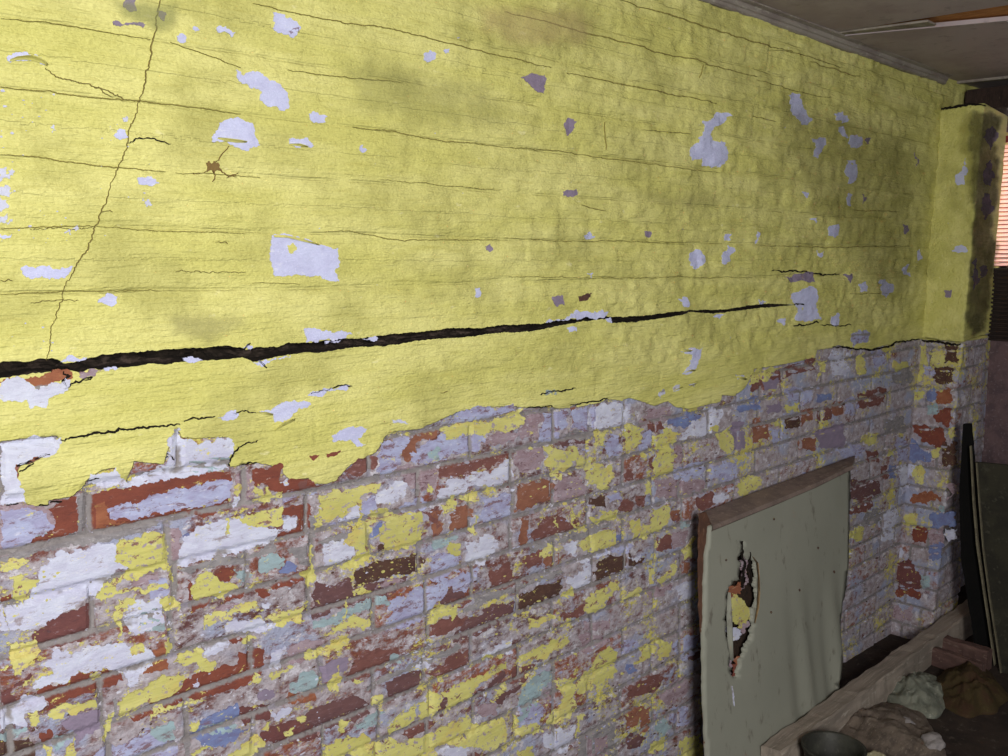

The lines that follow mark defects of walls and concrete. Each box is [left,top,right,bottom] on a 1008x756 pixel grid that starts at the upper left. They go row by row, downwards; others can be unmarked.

peeling [212,117,259,151]
peeling [236,70,290,111]
peeling [689,112,732,168]
peeling [789,93,813,125]
crack [0,0,961,388]
peeling [269,233,340,282]
peeling [777,271,840,326]
crack [16,410,258,472]
peeling [0,328,959,756]